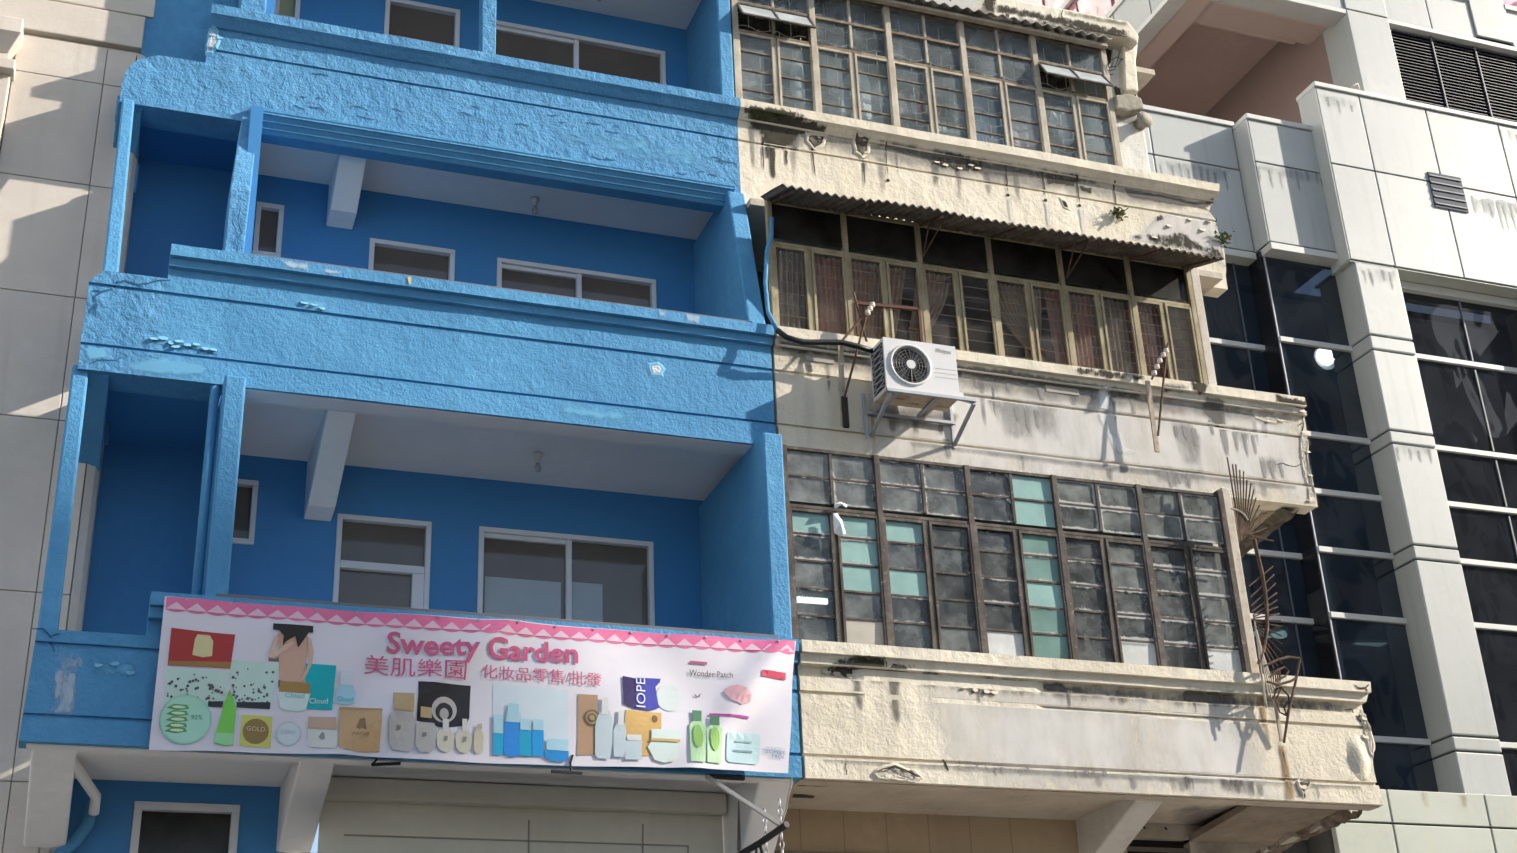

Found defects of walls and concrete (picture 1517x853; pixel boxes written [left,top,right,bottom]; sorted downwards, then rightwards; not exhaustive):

damp [744,105,826,178]
damp [846,142,1091,233]
damp [1113,180,1214,210]
peeling [1134,213,1223,263]
peeling [150,336,217,355]
damp [957,365,1284,487]
damp [823,656,938,720]
damp [1043,684,1145,704]
damp [1281,701,1332,709]
spalling [871,762,923,783]